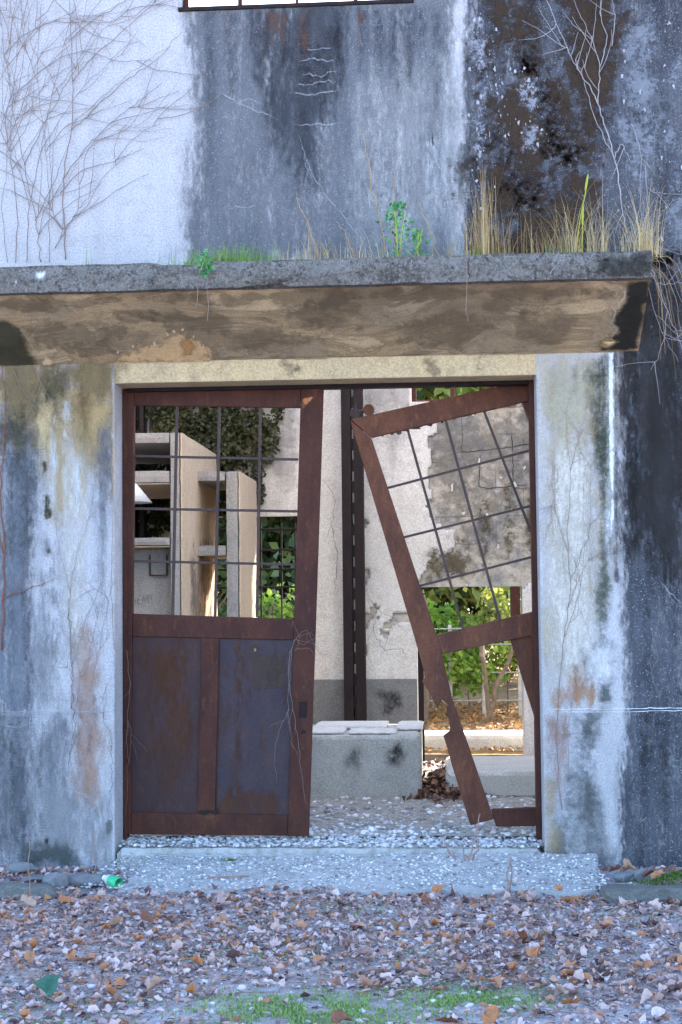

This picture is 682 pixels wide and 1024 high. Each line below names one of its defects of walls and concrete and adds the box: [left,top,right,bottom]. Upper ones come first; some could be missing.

spalling [117,328,212,363]
water stain [185,0,682,869]
flaking render [461,415,529,489]
water stain [0,321,114,867]
rust [553,672,595,708]